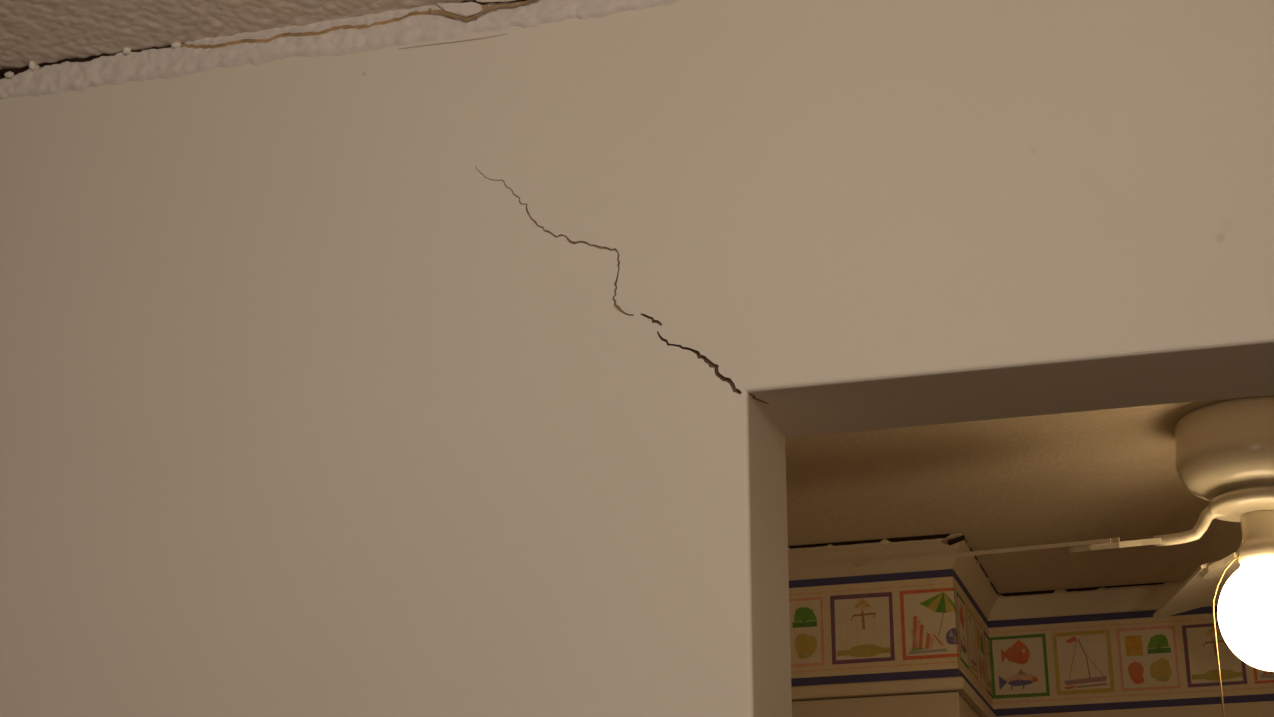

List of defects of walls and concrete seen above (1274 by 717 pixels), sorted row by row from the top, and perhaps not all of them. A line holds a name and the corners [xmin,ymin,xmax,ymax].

crack [181,5,488,49]
crack [475,166,769,404]